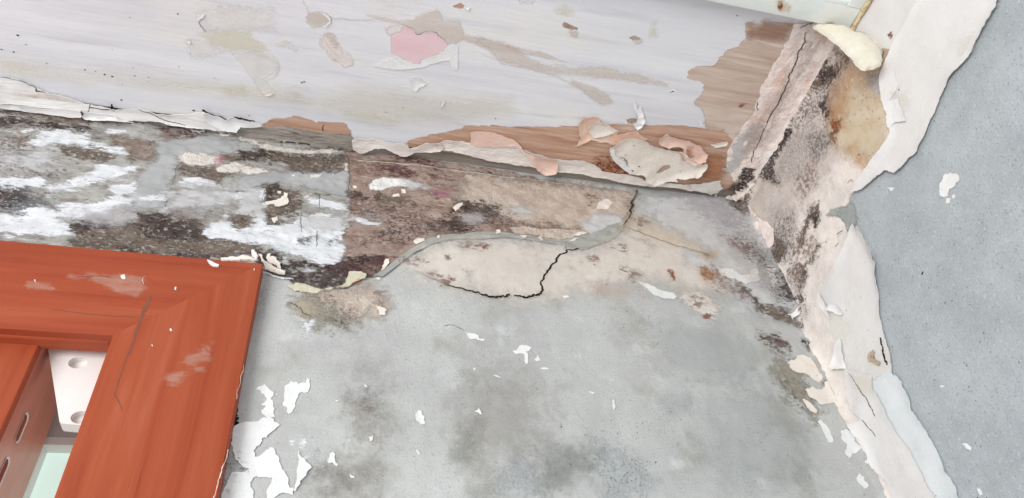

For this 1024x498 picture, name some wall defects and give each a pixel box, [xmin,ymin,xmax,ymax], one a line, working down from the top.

damp [0,109,511,331]
spalling [0,22,836,294]
crack [418,247,579,298]
damp [638,48,884,423]
crack [751,23,812,181]
peeling [939,172,960,204]
peeling [221,378,338,498]
peeling [787,355,868,489]